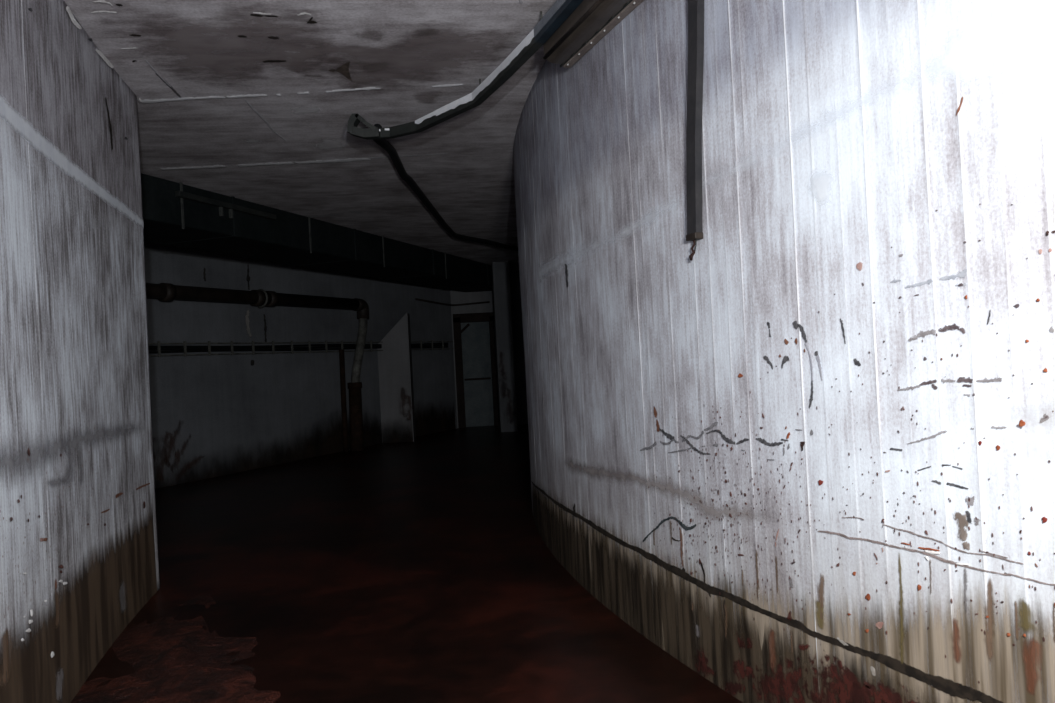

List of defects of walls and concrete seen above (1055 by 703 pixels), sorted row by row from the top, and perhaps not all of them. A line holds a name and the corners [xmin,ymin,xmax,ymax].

damp [133,8,505,88]
damp [0,512,157,703]
crack [531,481,1003,703]
damp [532,480,1055,703]